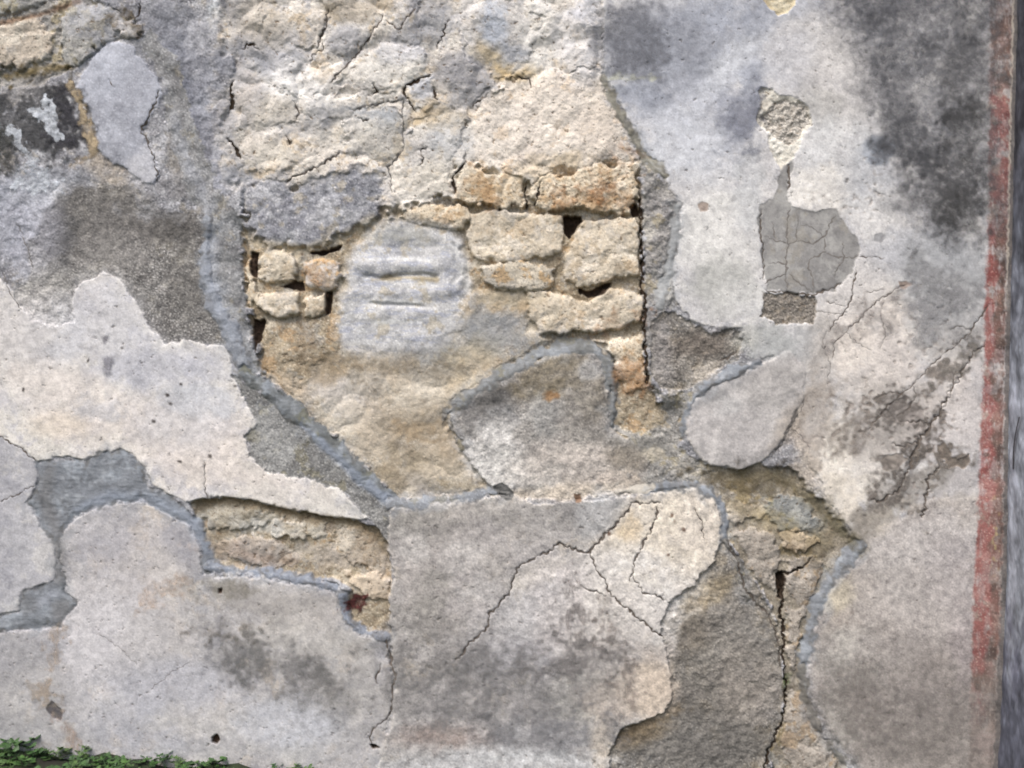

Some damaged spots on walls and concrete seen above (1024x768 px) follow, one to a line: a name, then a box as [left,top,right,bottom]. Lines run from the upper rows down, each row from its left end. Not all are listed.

spalling [0,0,145,159]
crack [353,75,438,191]
crack [451,162,466,193]
spalling [197,0,744,633]
crack [638,197,649,384]
spalling [756,88,813,170]
flaking render [760,292,818,326]
crack [759,165,905,377]
water stain [846,0,995,228]
crack [870,307,987,517]
crack [457,501,664,659]
crack [695,510,811,768]